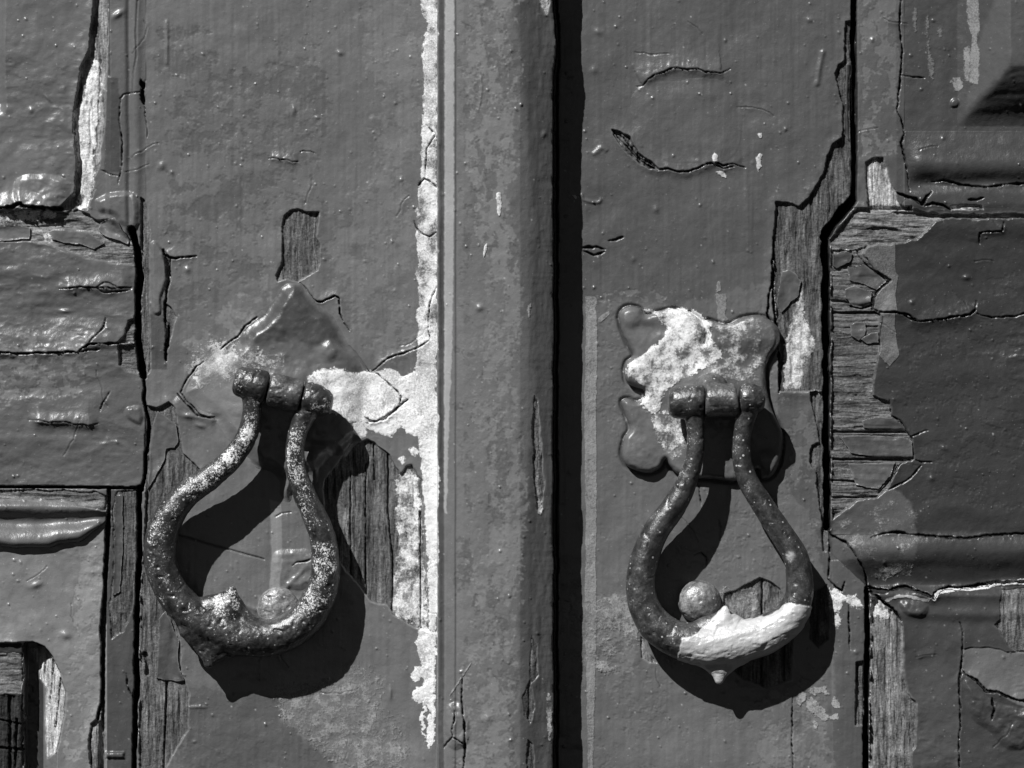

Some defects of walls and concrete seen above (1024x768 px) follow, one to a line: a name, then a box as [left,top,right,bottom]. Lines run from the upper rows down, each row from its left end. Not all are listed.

peeling [0,0,151,377]
crack [4,227,192,768]
peeling [0,403,200,768]
peeling [277,210,320,281]
peeling [323,440,429,629]
crack [622,137,732,172]
peeling [855,597,916,768]
peeling [773,22,1024,551]
crack [820,0,1024,768]
peeling [962,588,1024,704]